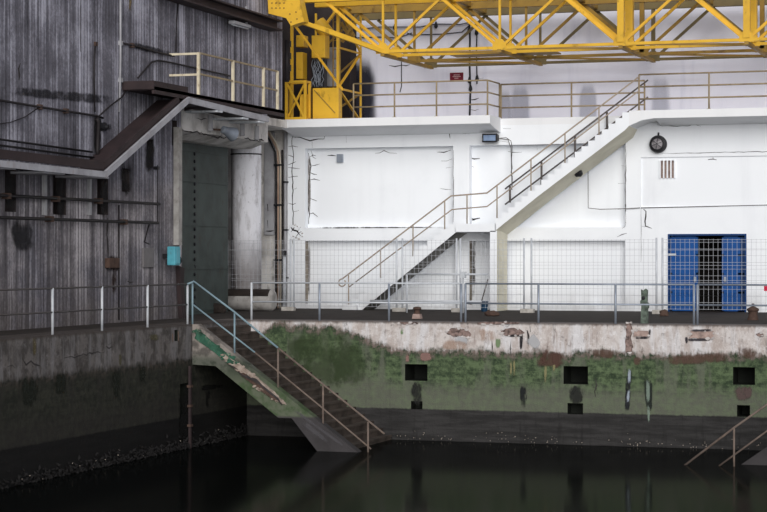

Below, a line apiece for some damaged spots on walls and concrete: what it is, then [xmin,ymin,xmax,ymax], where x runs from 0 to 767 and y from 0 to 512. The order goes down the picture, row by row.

crack [267,136,335,242]
spalling [445,327,471,339]
spalling [476,321,524,337]
leakage [510,335,540,349]
spalling [624,322,638,354]
peeling [192,329,286,405]
rust [539,350,562,377]
rust [589,350,612,358]
rust [669,353,724,364]
leakage [411,383,421,404]